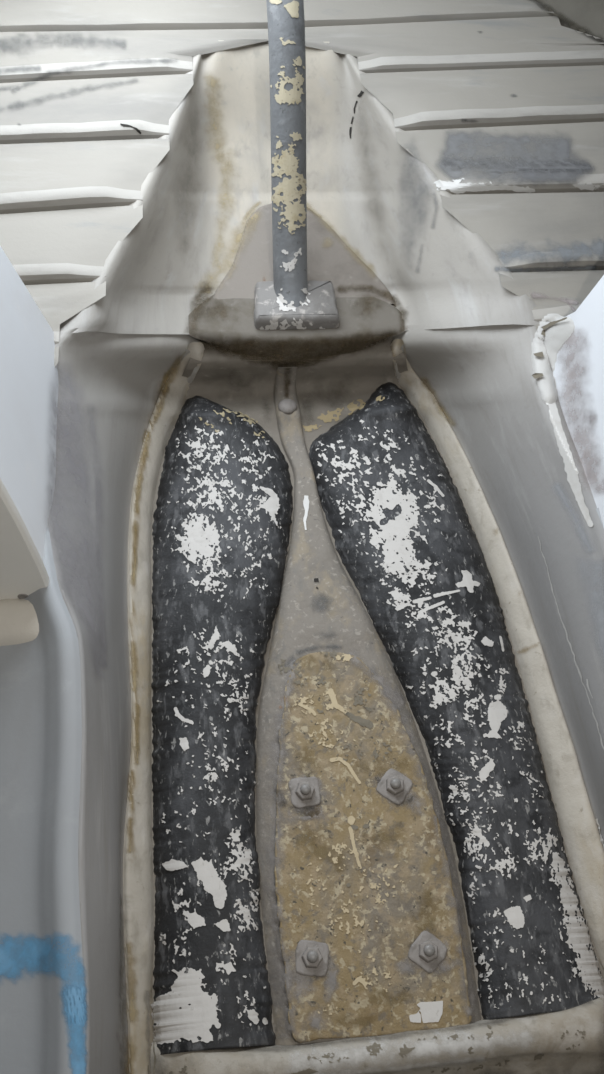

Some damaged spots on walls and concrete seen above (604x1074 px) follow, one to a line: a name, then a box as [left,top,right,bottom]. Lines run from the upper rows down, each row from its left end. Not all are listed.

peeling [269,0,299,18]
peeling [270,37,305,105]
leakage [439,133,591,182]
peeling [271,132,307,234]
peeling [280,248,302,272]
leakage [192,265,226,329]
peeling [260,288,325,330]